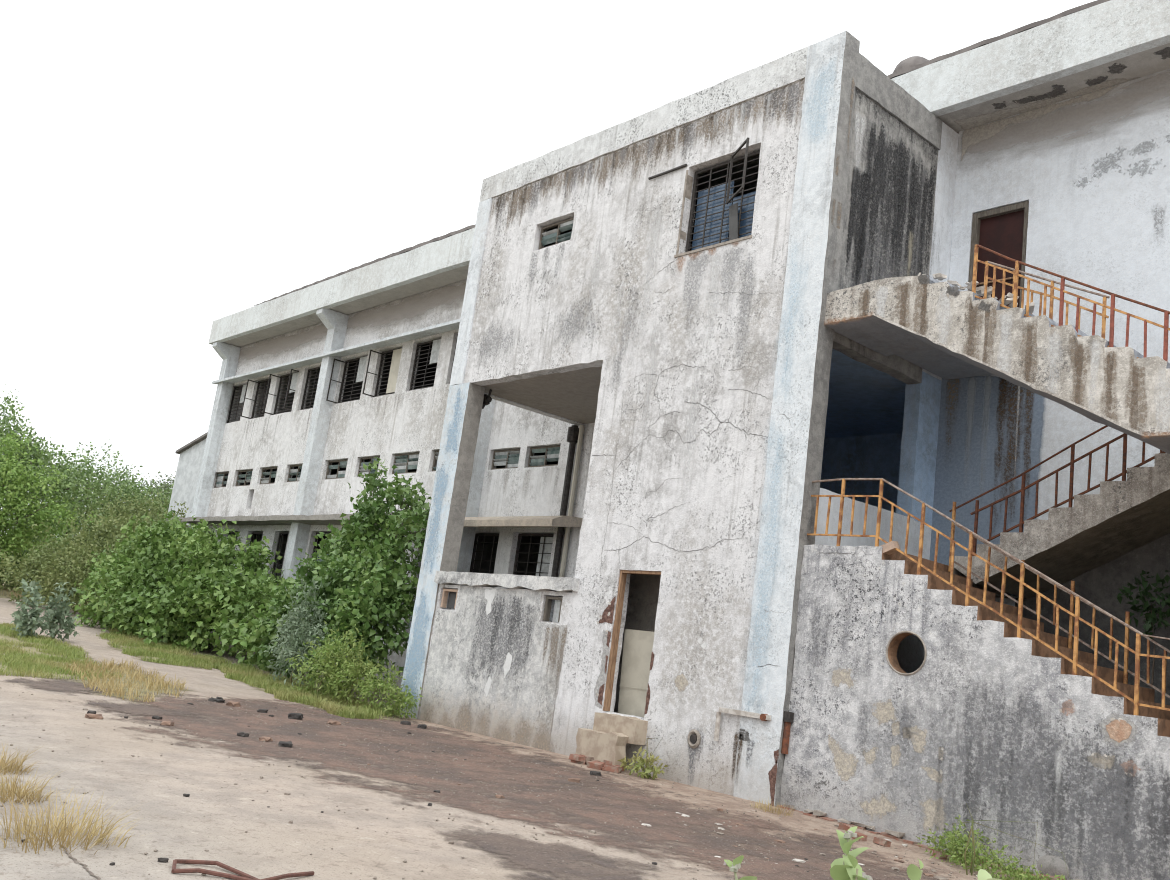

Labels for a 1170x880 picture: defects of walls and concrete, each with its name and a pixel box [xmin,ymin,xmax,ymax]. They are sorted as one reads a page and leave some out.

flaking render [992,84,1067,109]
flaking render [1084,63,1127,86]
flaking render [1155,47,1170,59]
water stain [490,80,805,227]
water stain [832,79,950,345]
flaking render [1074,135,1170,187]
water stain [946,298,1170,515]
crack [592,364,791,586]
water stain [468,598,536,674]
flaking render [594,597,616,708]
corrosion [768,749,779,806]
water stain [860,689,1170,880]